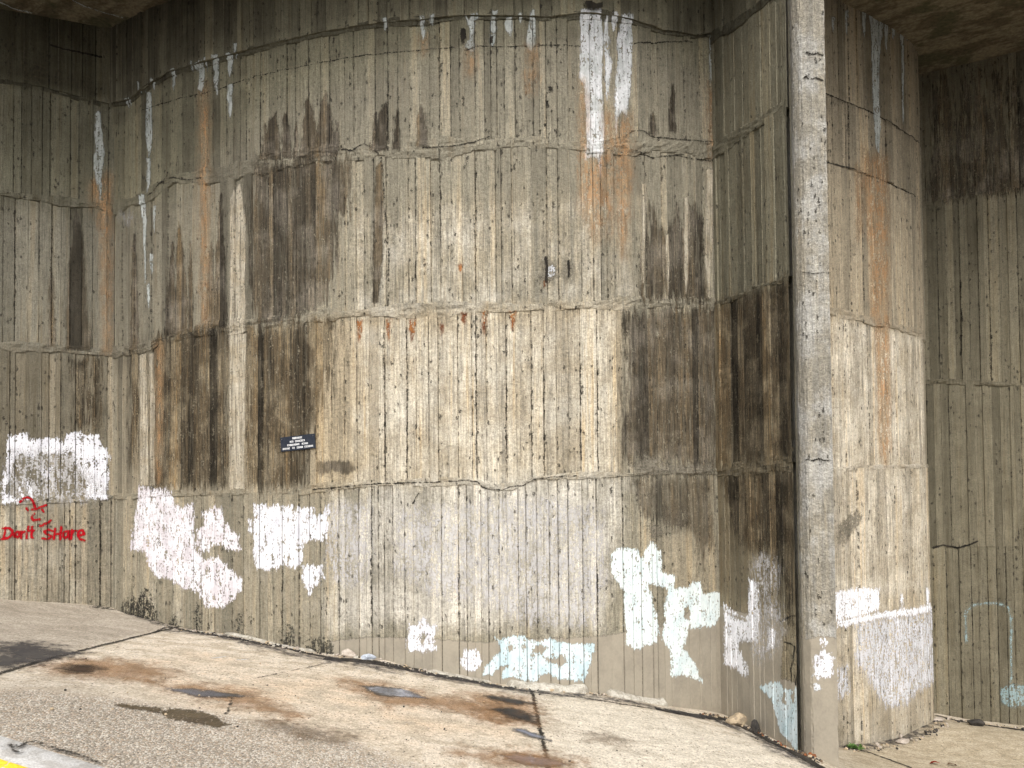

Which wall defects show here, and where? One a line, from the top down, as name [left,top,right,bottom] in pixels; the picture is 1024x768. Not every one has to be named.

water stain [94,111,105,198]
water stain [190,43,238,117]
water stain [369,103,400,303]
water stain [416,106,428,147]
water stain [579,8,633,175]
water stain [862,12,904,153]
water stain [925,66,1024,205]
water stain [125,79,353,493]
rust [857,154,891,458]
water stain [617,168,794,625]
crack [932,541,978,549]